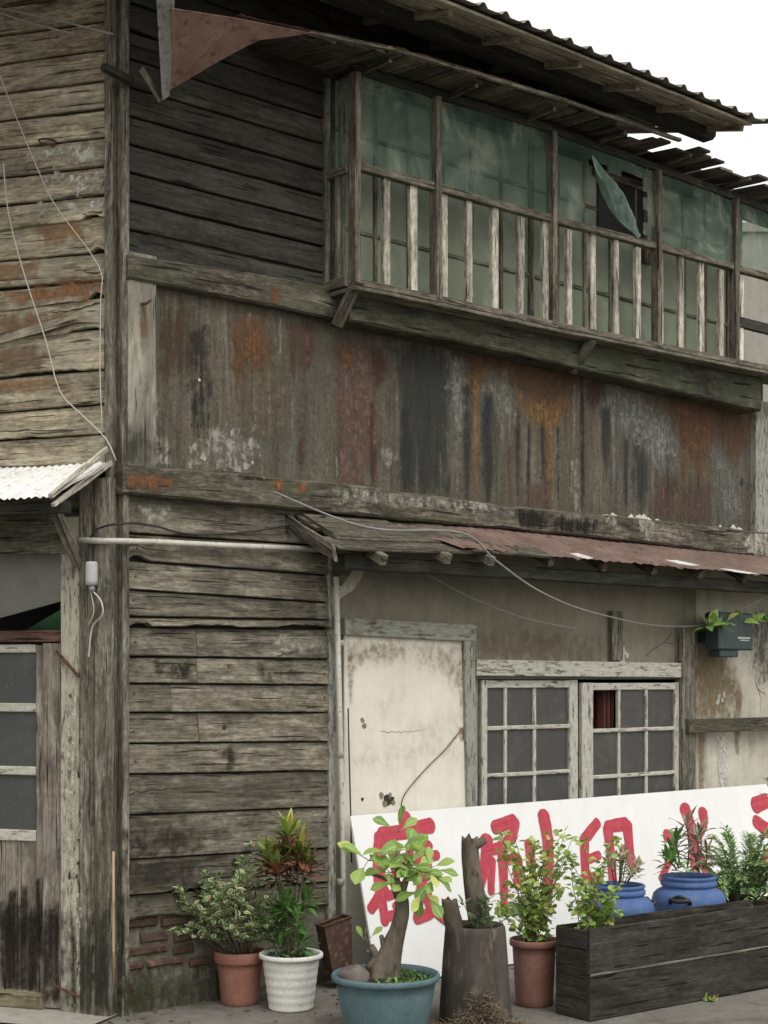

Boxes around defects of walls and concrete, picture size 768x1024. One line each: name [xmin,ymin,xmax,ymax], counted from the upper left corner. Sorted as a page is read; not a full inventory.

peeling [187,427,260,475]
corrosion [463,370,489,486]
water stain [394,343,597,533]
water stain [695,629,741,719]
water stain [753,612,768,681]
water stain [0,879,125,1013]